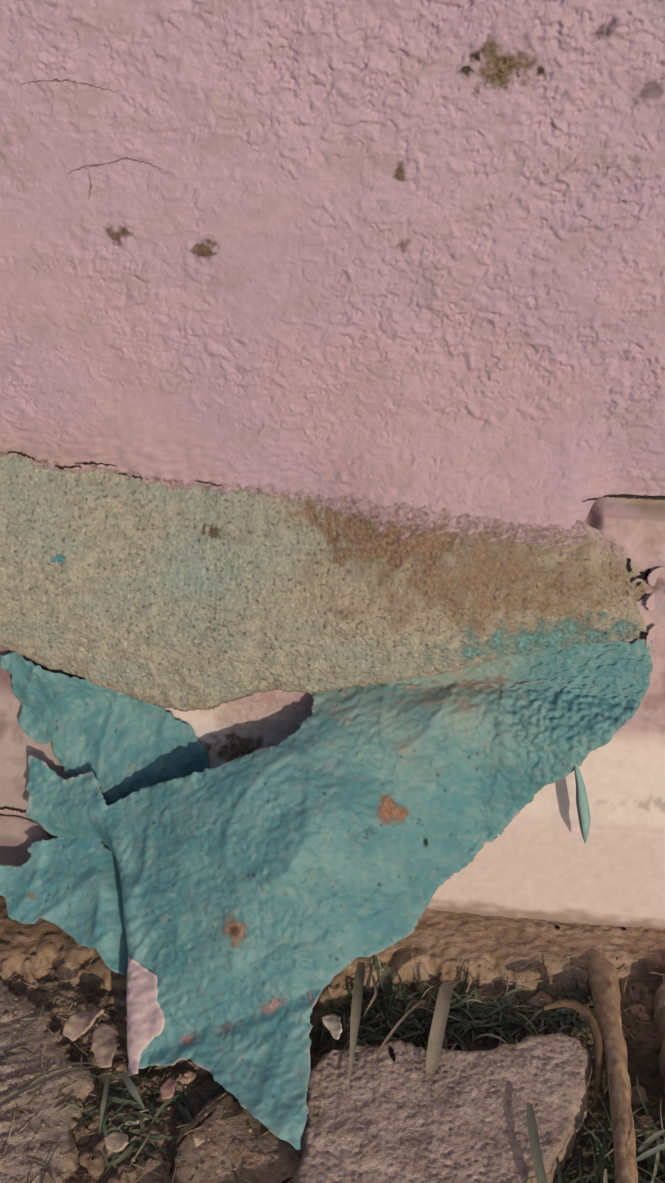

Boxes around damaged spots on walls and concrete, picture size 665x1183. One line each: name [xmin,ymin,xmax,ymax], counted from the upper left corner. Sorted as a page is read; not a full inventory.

crack [8,451,148,480]
peeling [0,453,653,1153]